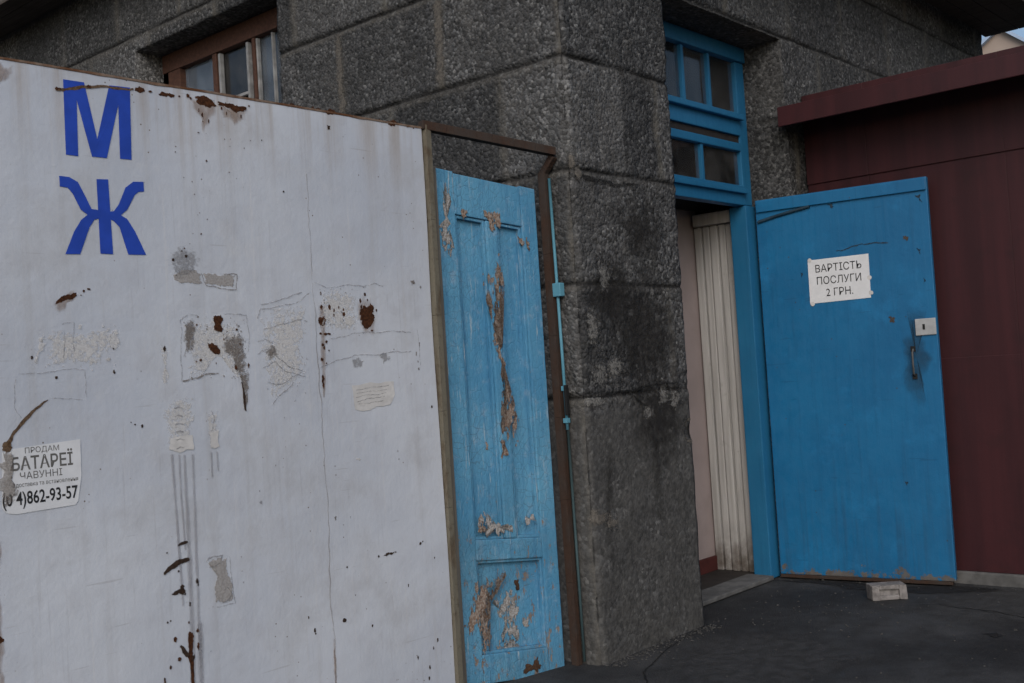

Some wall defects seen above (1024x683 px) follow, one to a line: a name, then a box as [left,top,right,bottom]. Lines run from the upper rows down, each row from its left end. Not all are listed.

corrosion [55,84,250,133]
peeling [439,183,468,257]
corrosion [56,288,90,304]
corrosion [359,293,377,331]
peeling [483,253,519,459]
damp [584,258,681,449]
corrosion [2,400,48,453]
peeling [478,511,513,537]
corrosion [164,621,200,683]
peeling [464,570,529,672]